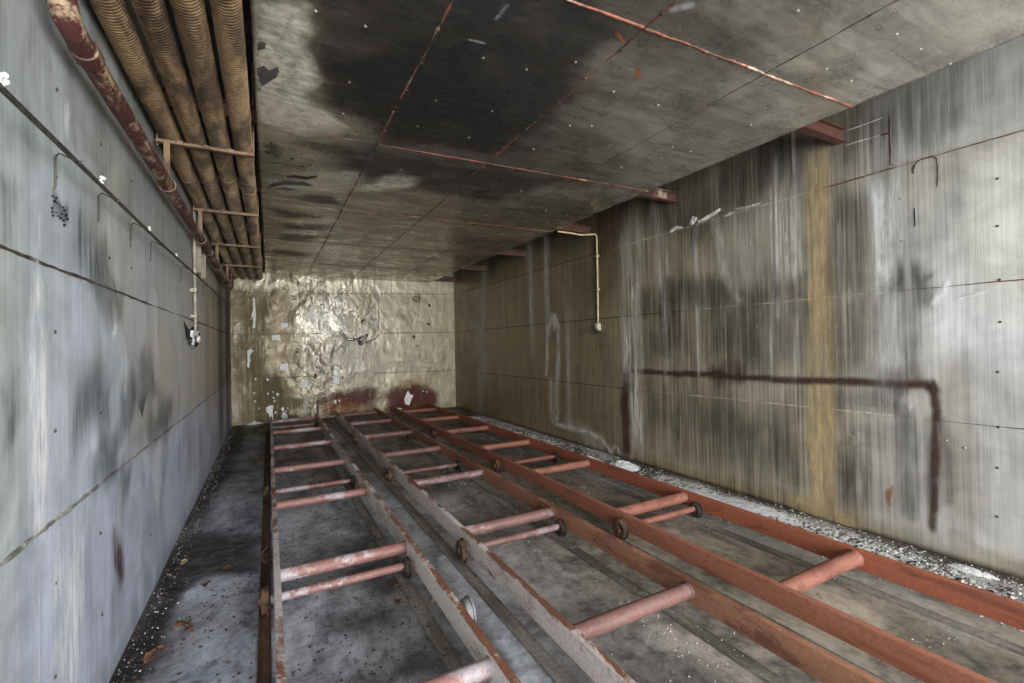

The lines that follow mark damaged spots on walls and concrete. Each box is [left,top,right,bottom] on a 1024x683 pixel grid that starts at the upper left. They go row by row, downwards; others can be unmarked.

leakage [320,147,550,199]
leakage [694,205,709,370]
leakage [742,131,797,309]
leakage [871,184,895,285]
leakage [28,267,48,546]
rust [320,381,438,413]
leakage [546,315,619,457]
leakage [623,323,642,444]
leakage [655,476,753,503]
leakage [785,514,924,569]
leakage [115,533,272,683]